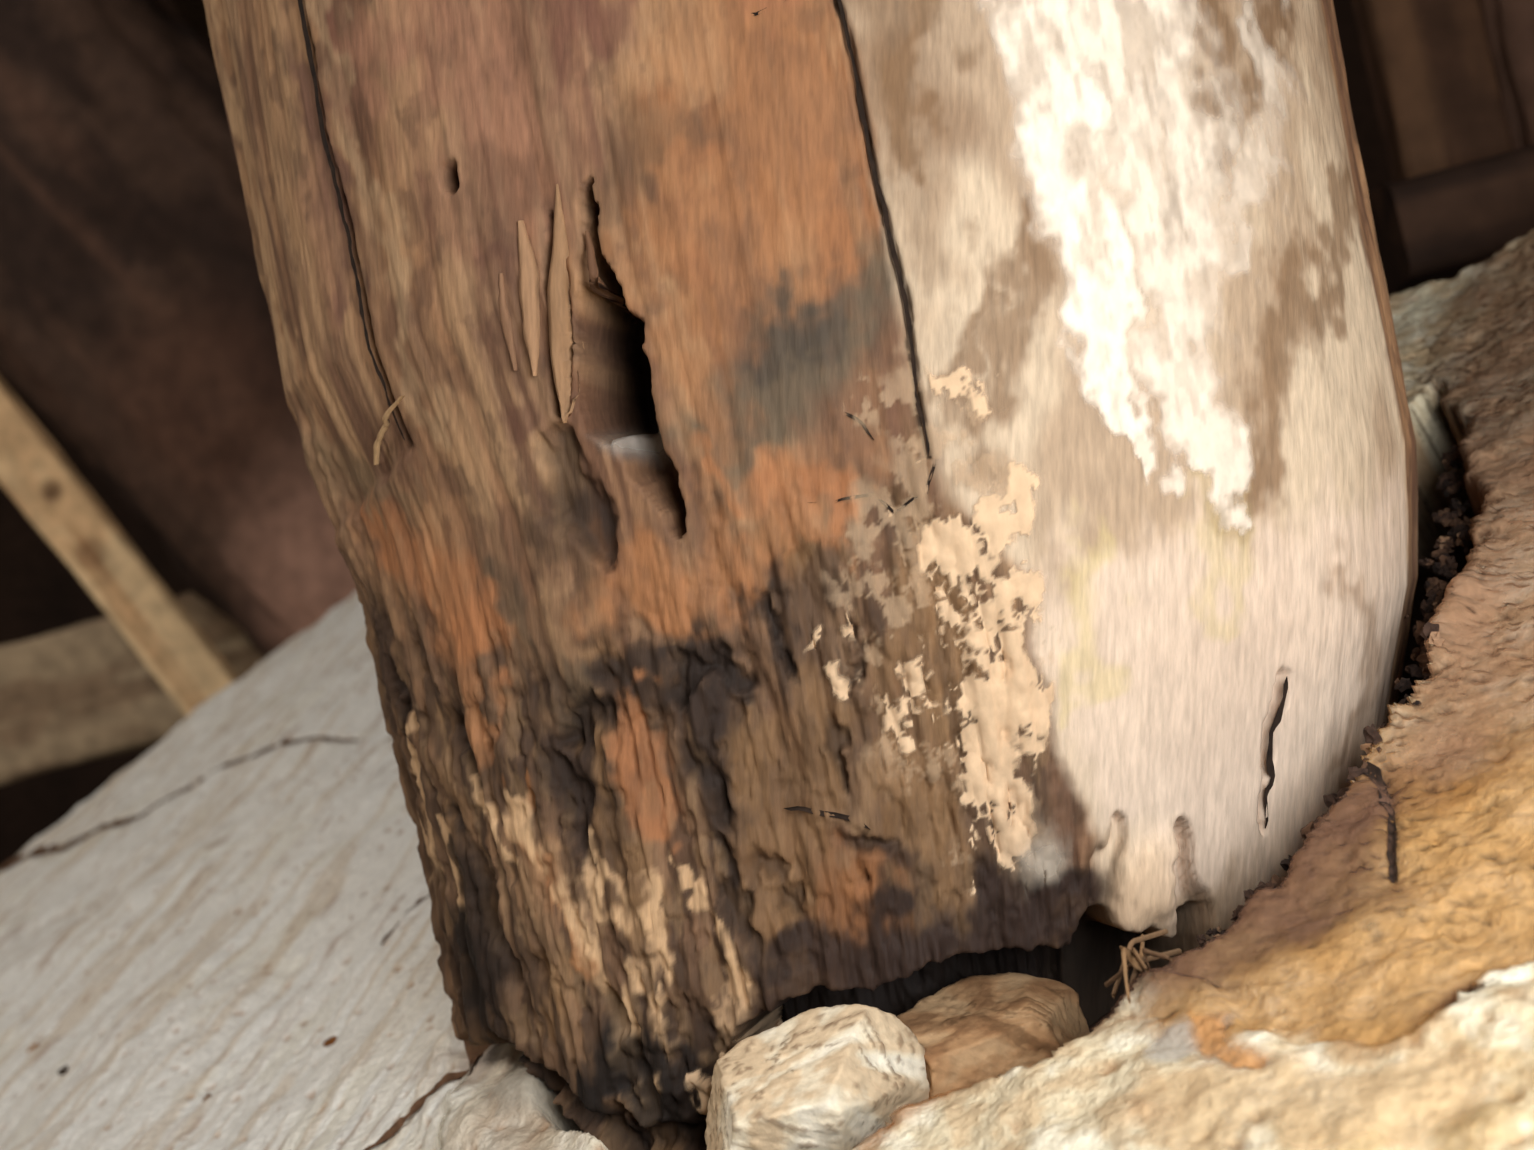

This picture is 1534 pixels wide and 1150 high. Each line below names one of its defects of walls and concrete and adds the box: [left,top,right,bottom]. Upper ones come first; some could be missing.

crack [298,0,405,440]
crack [808,0,936,513]
peeling [929,367,992,419]
peeling [809,626,822,649]
peeling [842,615,855,637]
peeling [825,662,849,700]
peeling [884,461,1054,870]
crack [0,736,392,871]
peeling [719,1005,784,1059]
crack [364,1053,481,1150]
peeling [686,1070,712,1115]